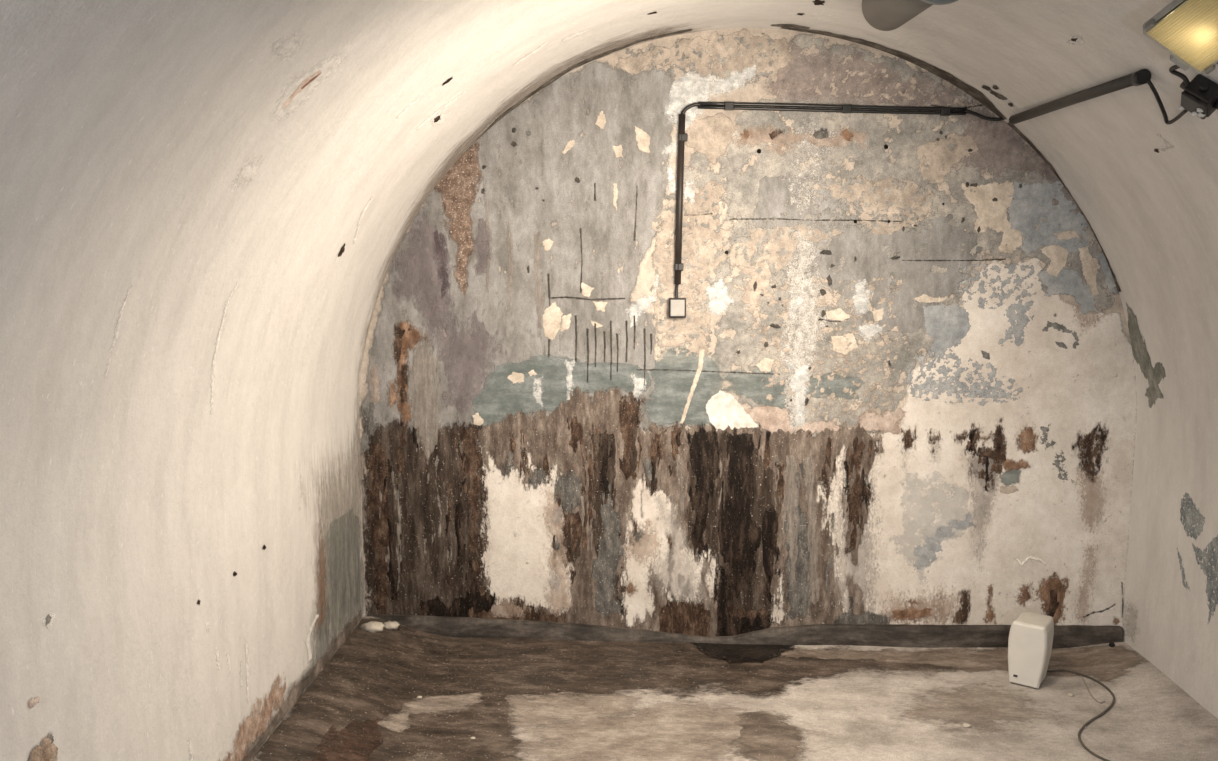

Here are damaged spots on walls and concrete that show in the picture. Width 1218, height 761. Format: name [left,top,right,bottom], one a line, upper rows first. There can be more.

water stain [663,41,1080,214]
peeling [360,28,1166,628]
water stain [242,28,961,761]
water stain [901,418,1039,492]
water stain [1072,424,1111,527]
peeling [1177,493,1218,622]
flaking render [29,733,58,761]
water stain [901,683,1041,732]